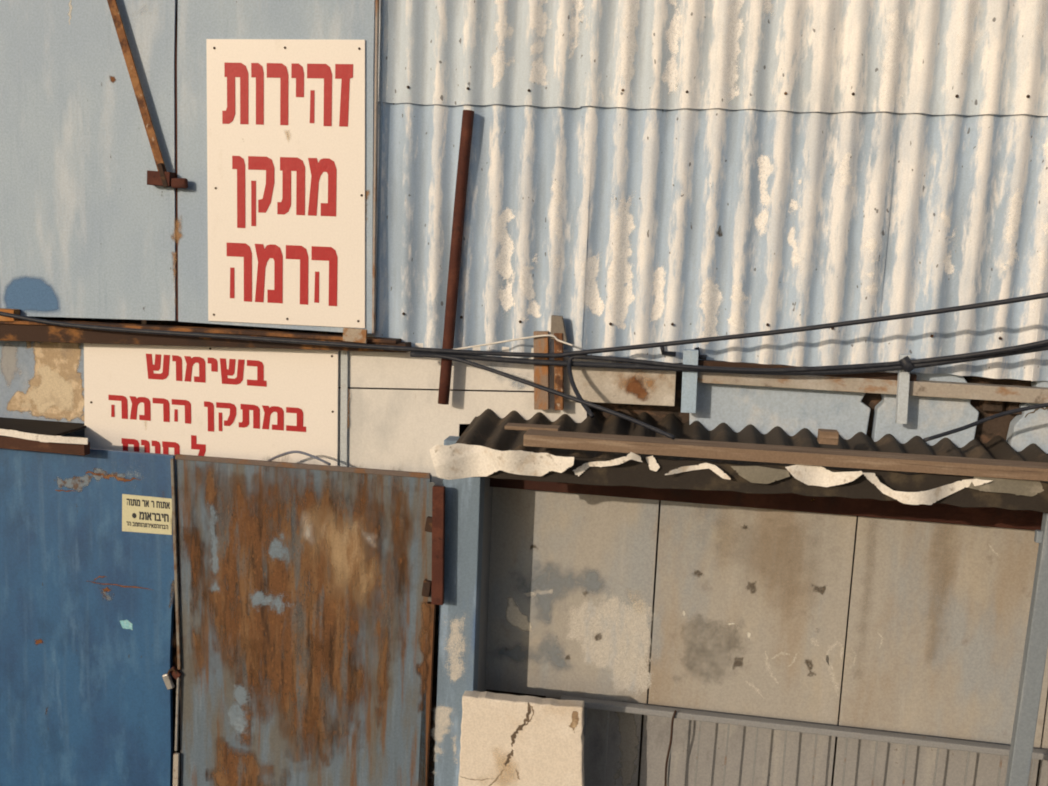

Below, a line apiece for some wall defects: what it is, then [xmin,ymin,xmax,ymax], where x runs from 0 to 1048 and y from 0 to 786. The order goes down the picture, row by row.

peeling [489,175,568,322]
peeling [577,191,672,330]
peeling [694,263,749,345]
peeling [750,151,804,272]
peeling [999,188,1023,277]
peeling [1030,140,1048,310]
flaking render [7,342,84,421]
peeling [55,468,139,492]
rust [177,465,409,786]
rust [416,602,436,786]
peeling [443,612,471,683]
crack [461,702,534,786]